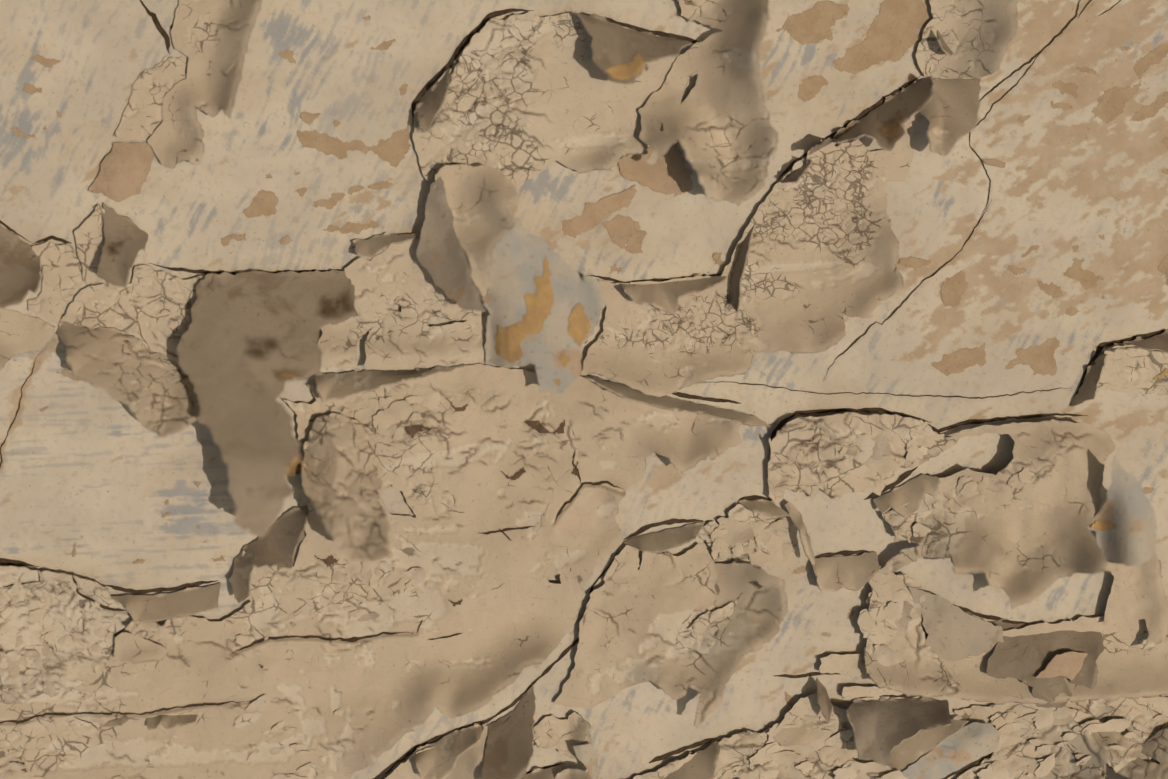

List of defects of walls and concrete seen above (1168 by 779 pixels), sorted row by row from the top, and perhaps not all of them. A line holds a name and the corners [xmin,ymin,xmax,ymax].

spalling [1092,44,1168,125]
crack [672,0,1165,456]
peeling [0,0,931,779]
spalling [931,343,986,376]
spalling [1006,337,1060,376]
peeling [1098,344,1168,396]
crack [0,558,40,587]
crack [72,575,218,611]
crack [230,620,462,655]
peeling [1035,651,1088,680]
crack [0,701,249,730]
crack [375,637,579,779]